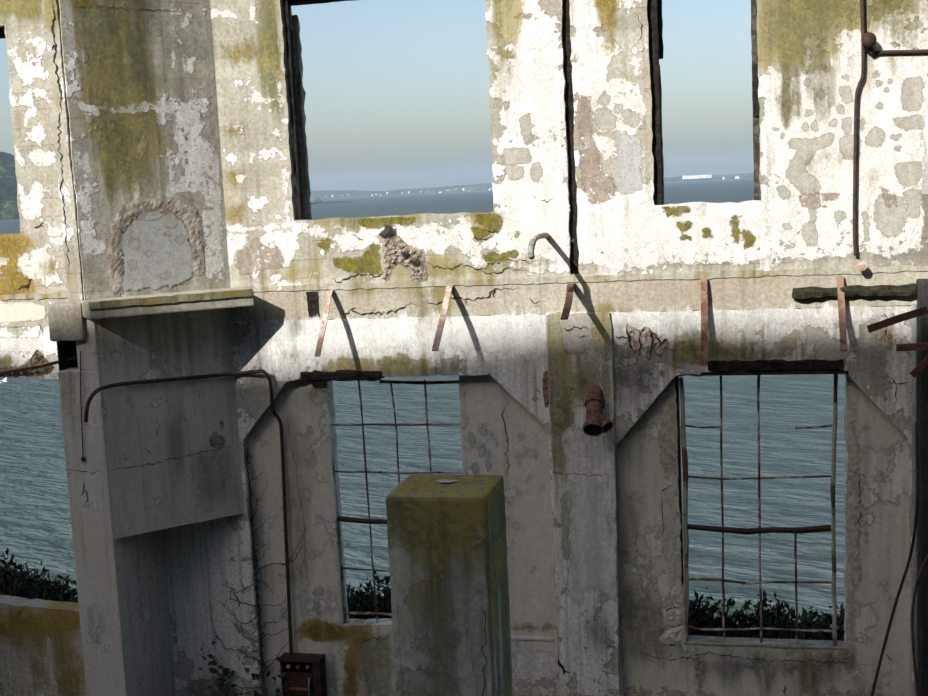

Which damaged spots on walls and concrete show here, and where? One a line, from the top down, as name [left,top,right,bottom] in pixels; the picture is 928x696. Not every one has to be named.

peeling [211,9,238,19]
leakage [782,66,800,128]
peeling [14,144,56,167]
crack [34,6,187,277]
peeling [74,37,570,286]
peeling [573,0,928,272]
peeling [18,181,44,221]
peeling [0,226,63,280]
peeling [0,301,46,323]
peeling [0,335,54,378]
peeling [610,298,879,377]
spalling [658,485,687,645]